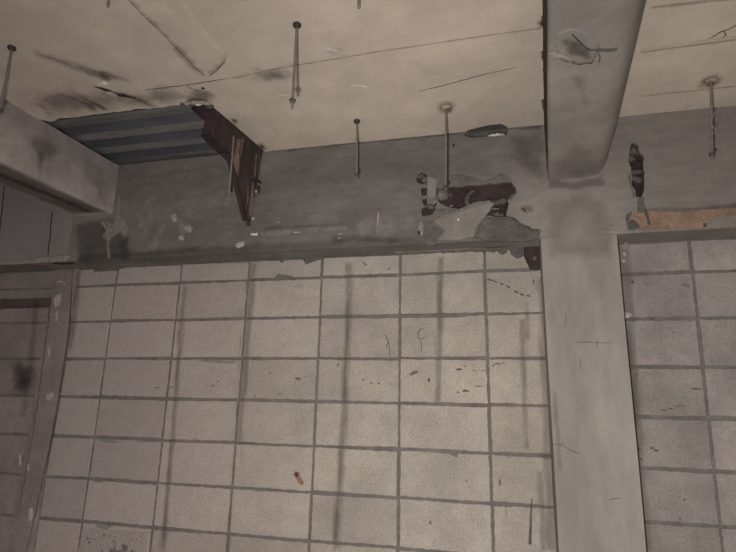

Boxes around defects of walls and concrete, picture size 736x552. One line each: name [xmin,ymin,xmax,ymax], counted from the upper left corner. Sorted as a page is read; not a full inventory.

spalling [466,124,508,138]
spalling [417,169,541,246]
spalling [625,144,736,230]